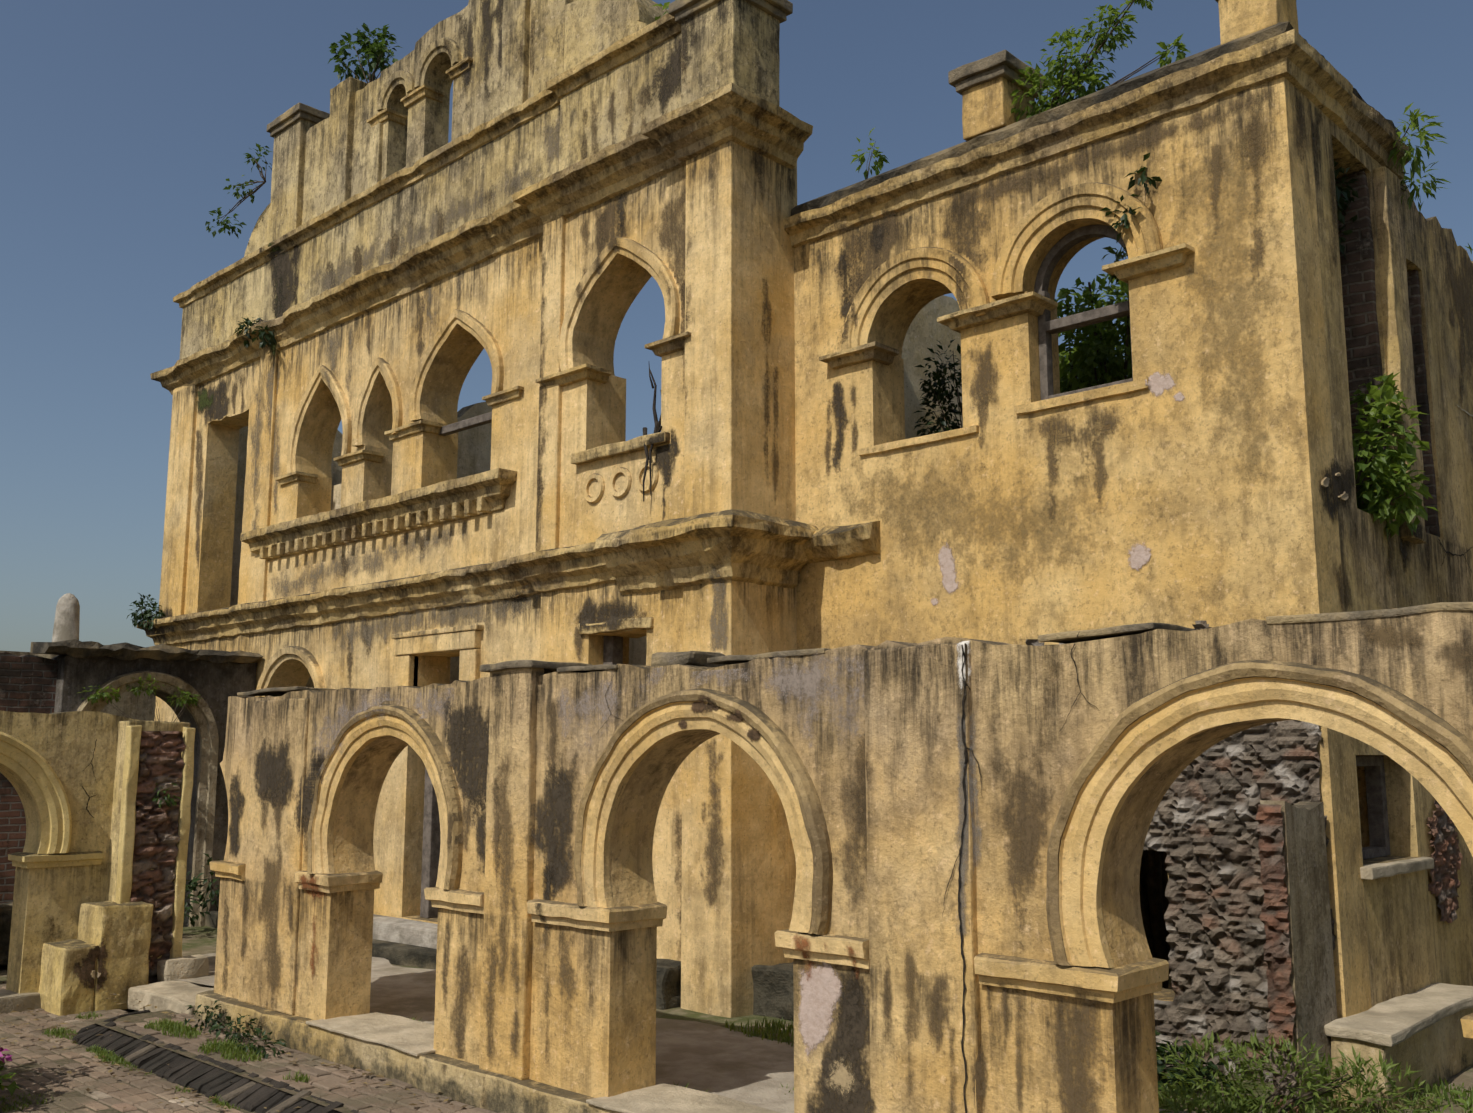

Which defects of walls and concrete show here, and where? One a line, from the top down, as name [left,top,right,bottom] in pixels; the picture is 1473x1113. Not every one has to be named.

water stain [834,211,900,361]
water stain [943,87,1269,469]
water stain [825,382,857,472]
peeling [931,544,958,605]
water stain [850,398,1118,579]
peeling [1145,372,1184,401]
water stain [222,695,390,1023]
water stain [416,687,519,1070]
water stain [531,682,617,1012]
water stain [701,740,724,906]
crack [942,645,982,1113]
spalling [799,963,875,1113]